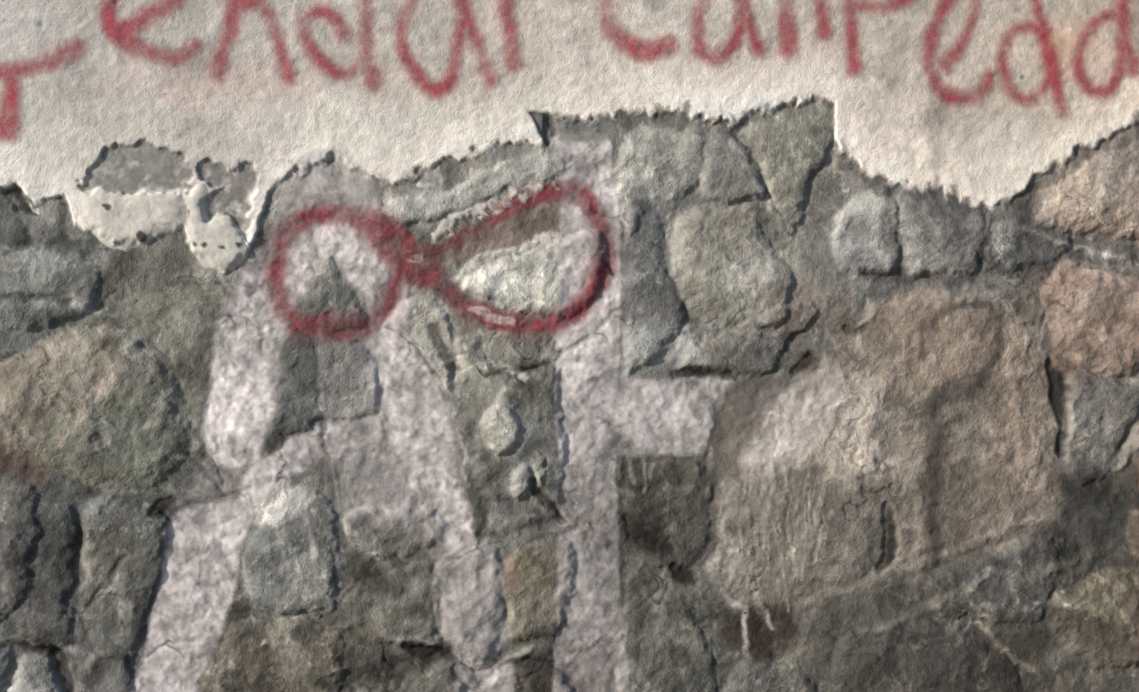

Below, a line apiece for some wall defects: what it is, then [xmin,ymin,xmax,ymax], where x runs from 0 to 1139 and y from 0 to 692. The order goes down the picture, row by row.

spalling [551,117,614,139]
peeling [80,140,257,271]
peeling [468,306,515,325]
leakage [701,380,832,656]